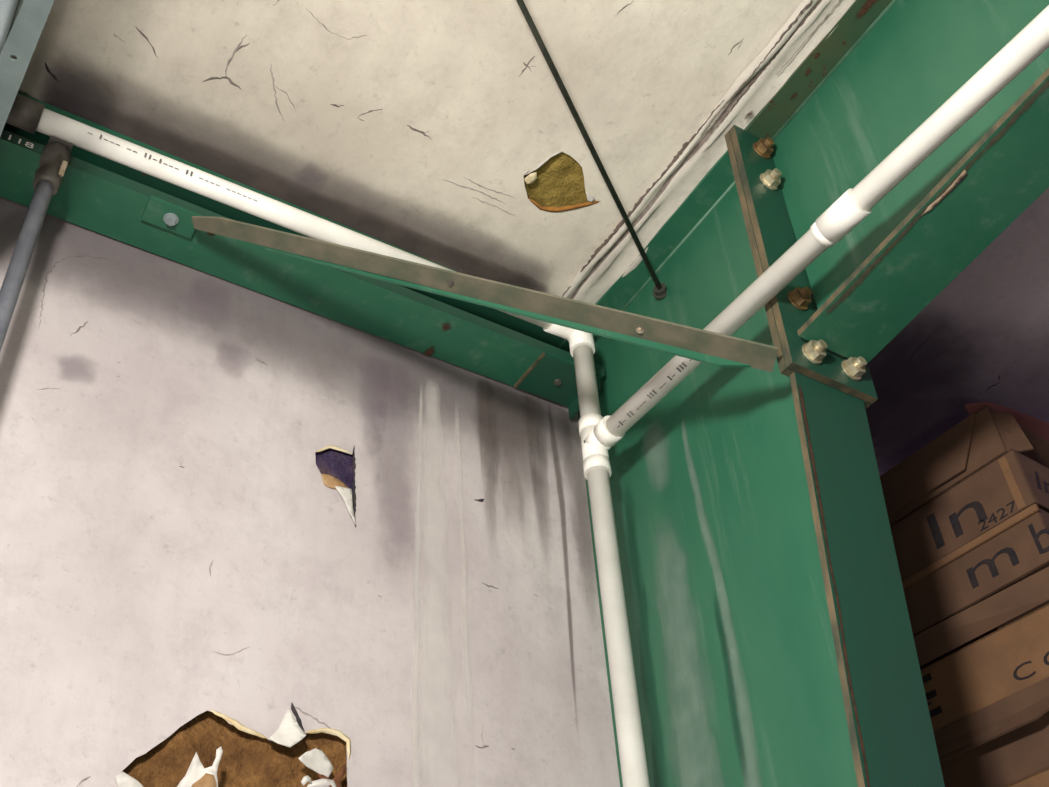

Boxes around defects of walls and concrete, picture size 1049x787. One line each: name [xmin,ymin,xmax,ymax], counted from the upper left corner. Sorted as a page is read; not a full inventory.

crack [202,34,250,89]